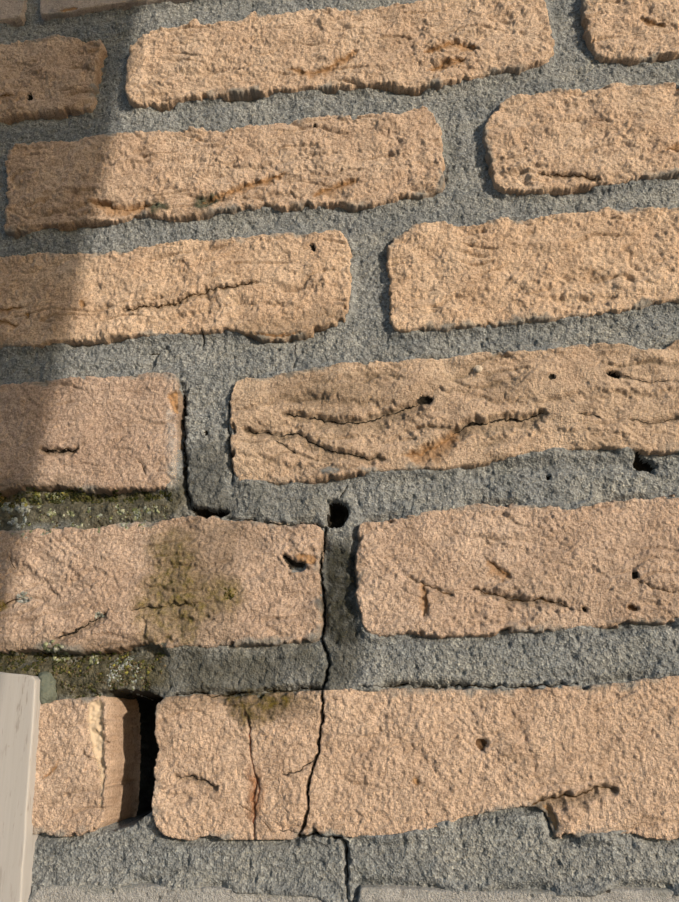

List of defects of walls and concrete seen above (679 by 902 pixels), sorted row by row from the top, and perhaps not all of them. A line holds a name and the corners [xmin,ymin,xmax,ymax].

crack [176,518,349,902]